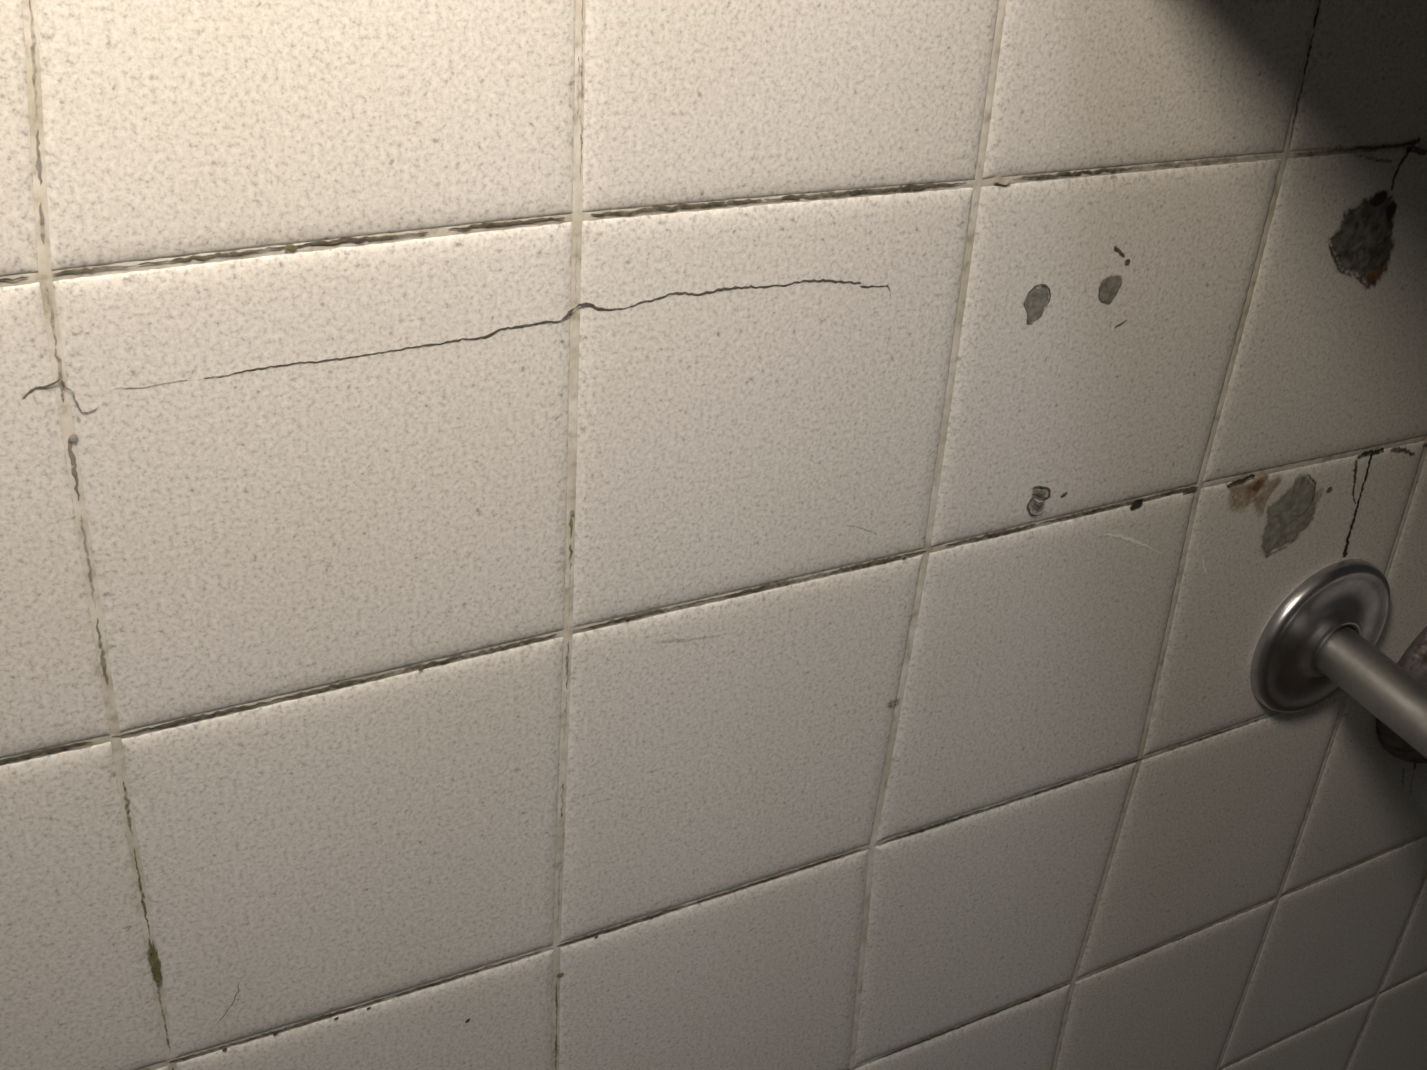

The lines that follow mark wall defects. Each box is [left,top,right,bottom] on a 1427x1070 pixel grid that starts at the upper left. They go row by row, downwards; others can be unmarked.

crack [185,279,890,381]
peeling [1023,284,1051,325]
peeling [1098,246,1130,304]
spalling [1329,190,1397,288]
crack [23,379,96,414]
spalling [1261,474,1332,557]
crack [1343,443,1427,557]